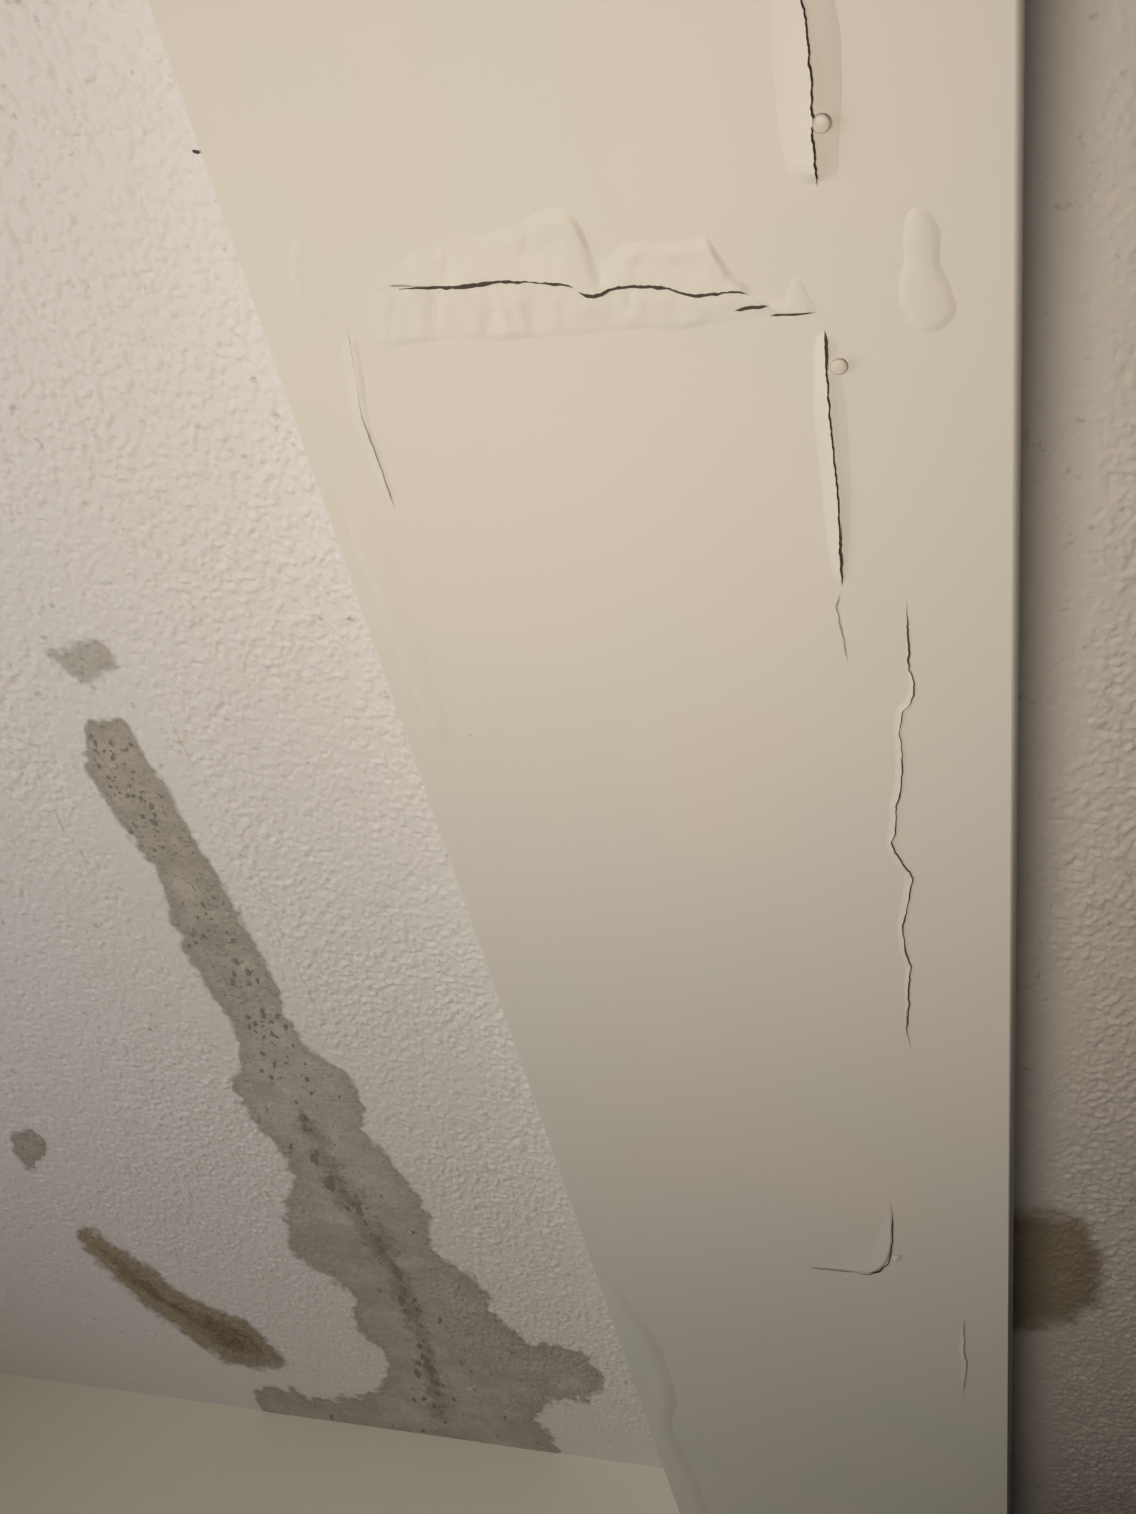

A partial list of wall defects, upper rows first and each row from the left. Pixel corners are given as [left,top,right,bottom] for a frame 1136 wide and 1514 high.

peeling [771,0,842,186]
peeling [813,332,851,662]
crack [885,602,915,1049]
leakage [85,719,603,1453]
crack [812,1208,893,1275]
leakage [1012,1217,1099,1328]